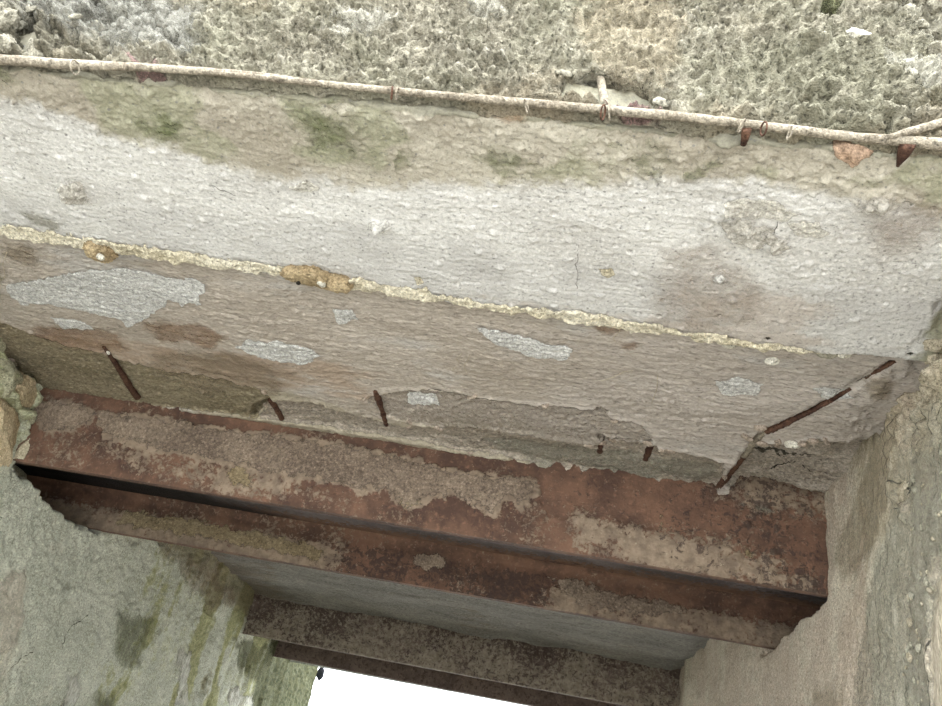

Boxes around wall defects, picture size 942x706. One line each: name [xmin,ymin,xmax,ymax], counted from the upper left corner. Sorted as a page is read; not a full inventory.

rust [126,52,167,82]
spalling [0,52,942,152]
rust [604,99,662,125]
damp [0,224,284,276]
peeling [0,253,205,330]
peeling [332,309,358,325]
damp [348,277,820,355]
spalling [864,360,896,379]
spalling [0,323,864,493]